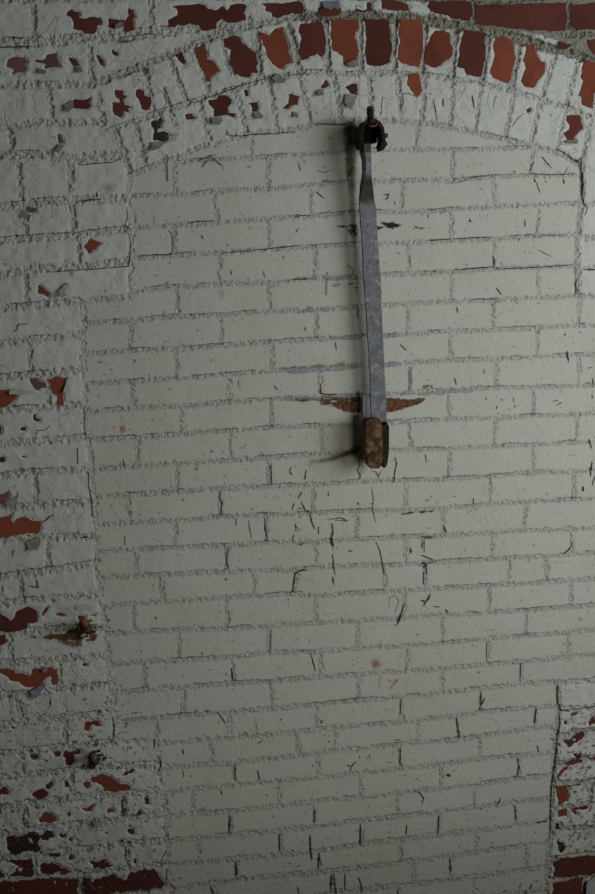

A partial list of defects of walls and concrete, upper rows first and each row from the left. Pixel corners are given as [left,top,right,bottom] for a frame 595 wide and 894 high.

peeling [67,8,136,34]
peeling [169,4,246,31]
peeling [224,0,595,109]
peeling [112,89,152,117]
peeling [564,115,584,144]
corrosion [295,397,362,413]
corrosion [386,385,437,412]
peeling [0,606,102,646]
corrosion [31,632,97,647]
crack [514,686,595,838]
peeling [0,781,165,894]
peeling [553,841,595,894]